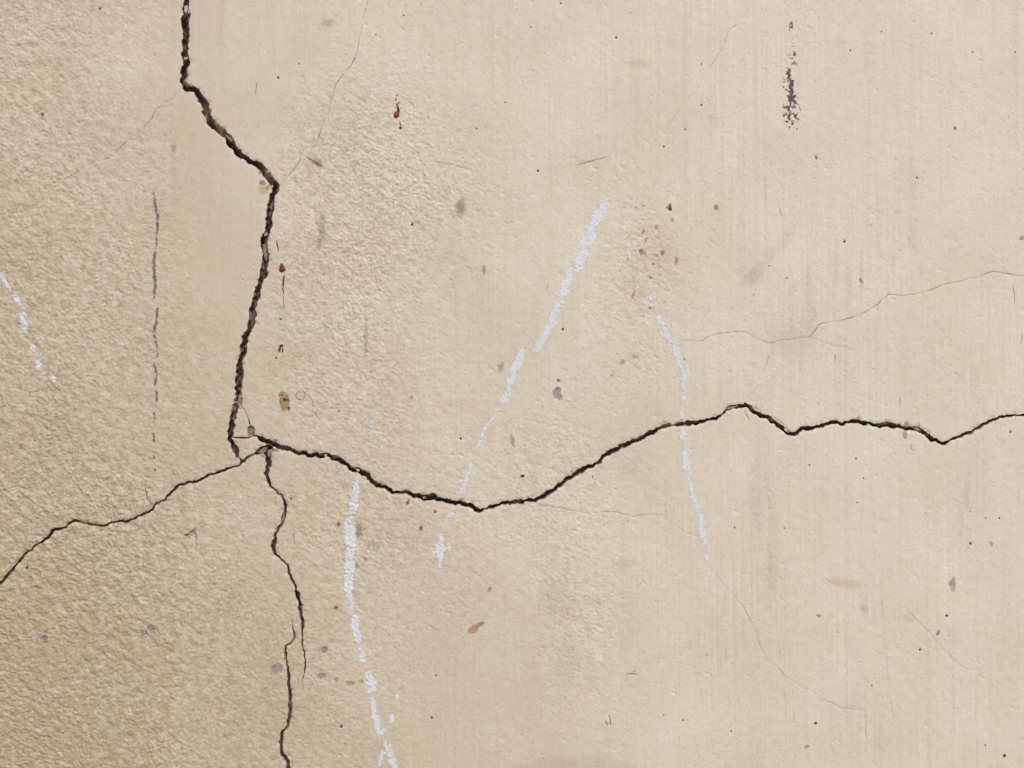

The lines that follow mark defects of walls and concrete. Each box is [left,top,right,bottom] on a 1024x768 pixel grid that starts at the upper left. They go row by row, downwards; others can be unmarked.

crack [0,0,306,683]
crack [254,402,1024,513]
crack [279,621,296,768]